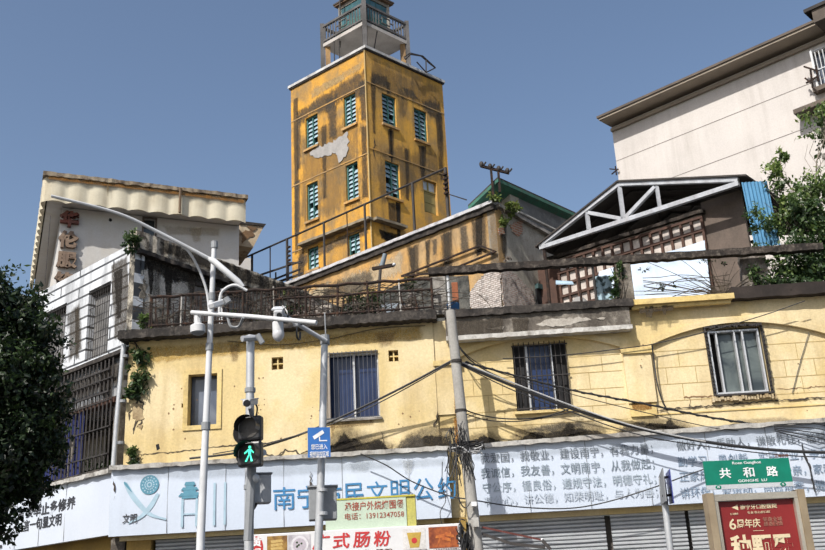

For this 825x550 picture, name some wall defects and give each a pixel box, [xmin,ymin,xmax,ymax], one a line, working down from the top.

peeling [310,131,350,163]
leakage [404,88,443,179]
leakage [293,63,390,276]
leakage [379,148,409,241]
peeling [241,226,257,243]
leakage [139,216,487,312]
leakage [112,258,128,339]
peeling [536,317,606,327]
leakage [330,426,453,452]
leakage [470,432,502,443]
leakage [519,419,605,440]